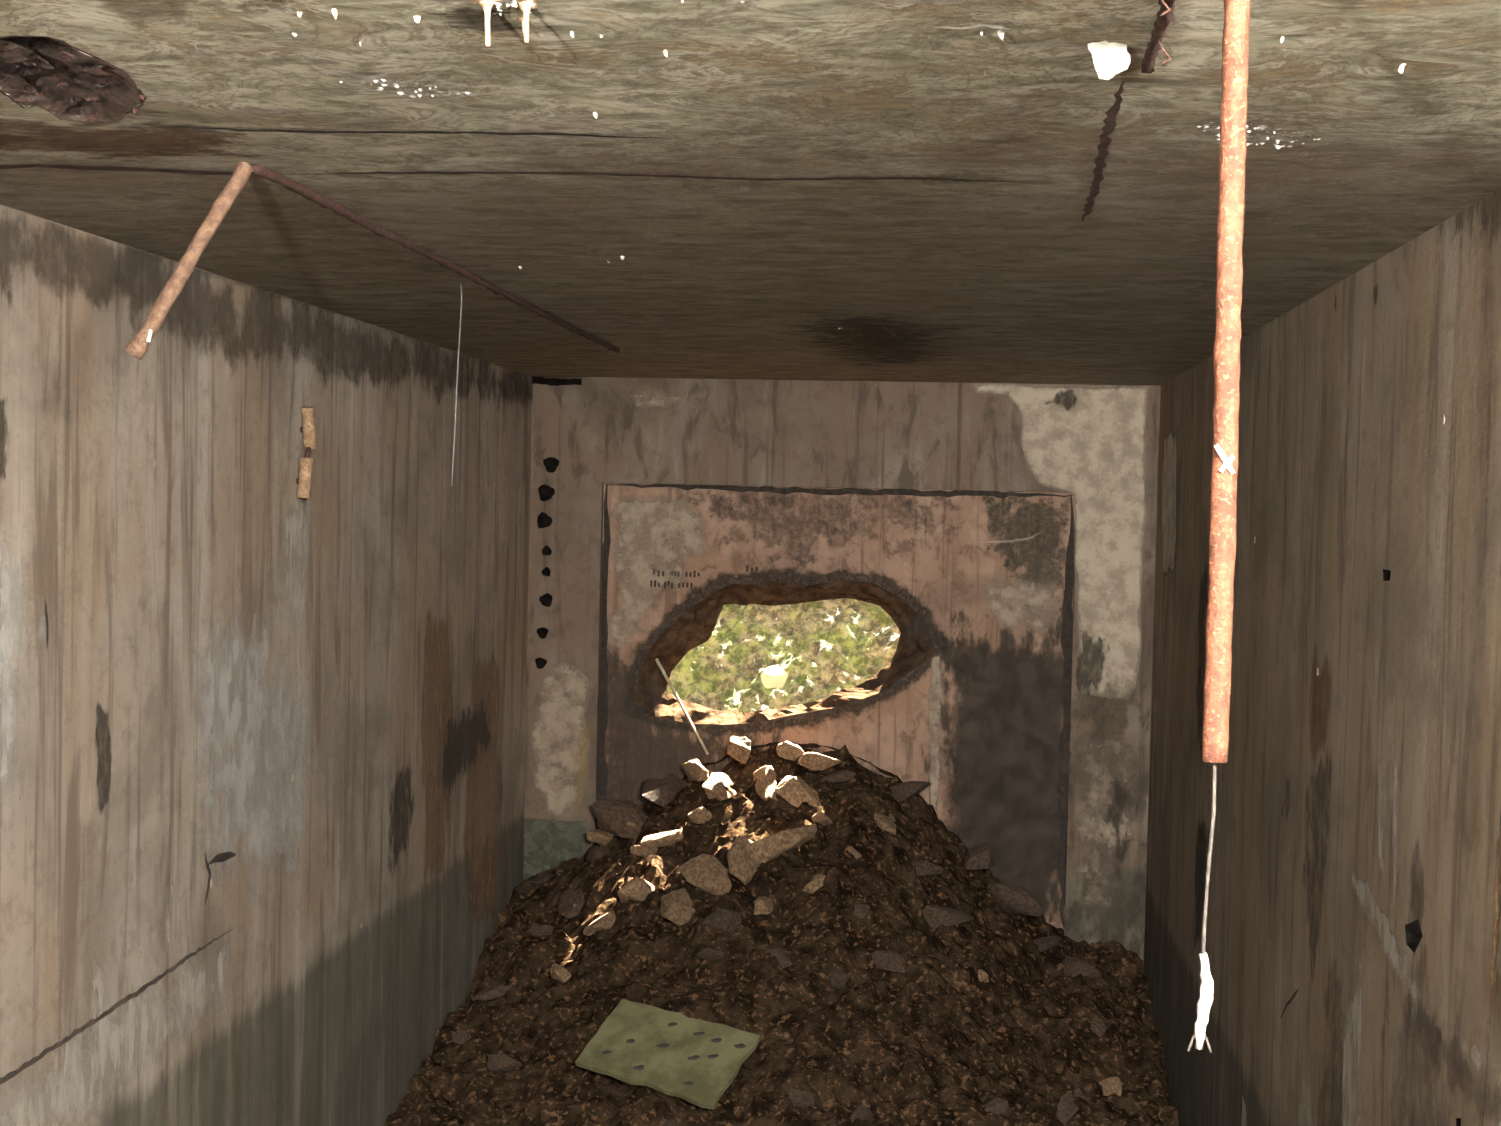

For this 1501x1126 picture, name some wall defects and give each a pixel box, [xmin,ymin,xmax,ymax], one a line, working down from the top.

spalling [0,35,147,123]
crack [0,164,253,175]
crack [161,126,1054,183]
crack [1081,81,1125,222]
hole [628,568,946,737]